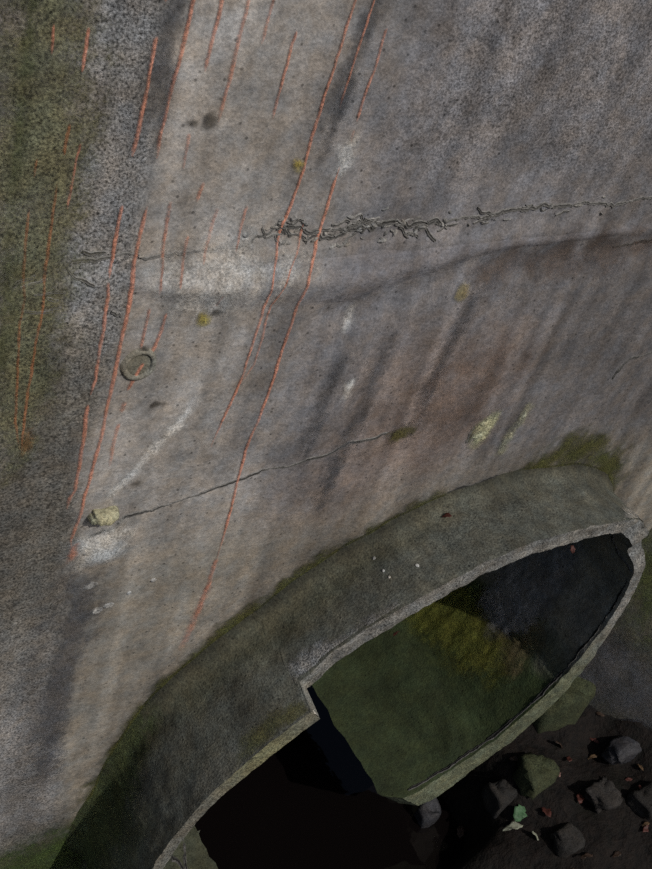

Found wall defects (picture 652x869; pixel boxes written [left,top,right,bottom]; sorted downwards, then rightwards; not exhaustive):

corrosion [82,29,90,71]
corrosion [133,39,157,150]
corrosion [218,0,357,431]
crack [0,196,652,322]
corrosion [69,207,147,533]
corrosion [223,173,338,539]
leakage [318,360,354,408]
crack [74,432,389,542]